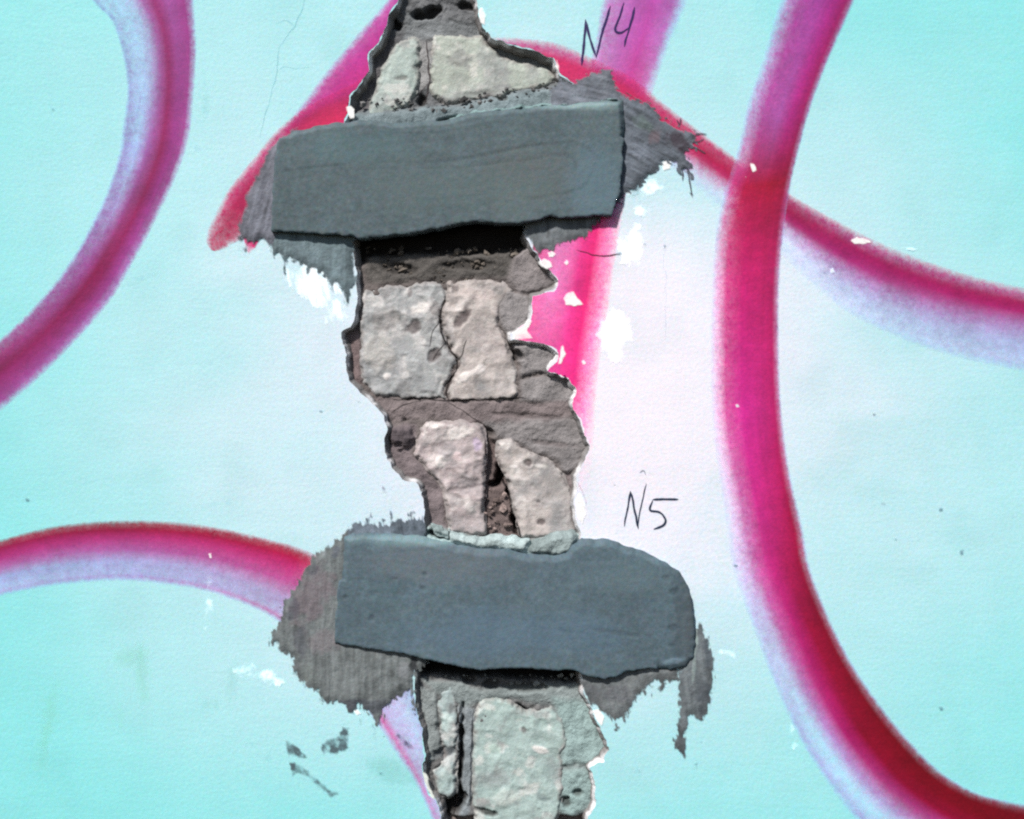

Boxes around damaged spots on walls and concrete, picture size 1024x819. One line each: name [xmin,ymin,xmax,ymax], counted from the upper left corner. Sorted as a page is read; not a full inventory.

flaking render [347,0,558,123]
flaking render [347,224,586,554]
flaking render [420,660,604,819]